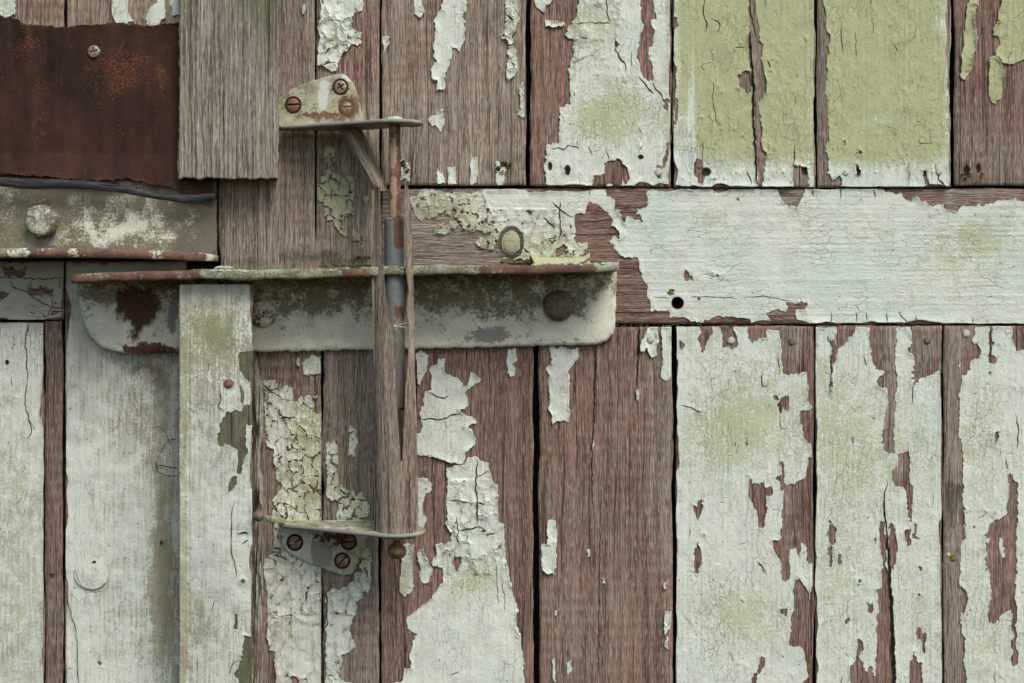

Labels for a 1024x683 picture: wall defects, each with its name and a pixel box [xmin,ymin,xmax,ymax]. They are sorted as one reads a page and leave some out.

peeling [317,0,364,72]
peeling [414,0,467,91]
peeling [501,0,525,118]
peeling [637,0,656,81]
peeling [737,0,767,187]
peeling [778,0,843,208]
peeling [883,175,1024,212]
rust [115,286,178,357]
peeling [217,351,372,683]
peeling [396,348,525,683]
peeling [530,159,813,683]
peeling [850,326,1019,683]